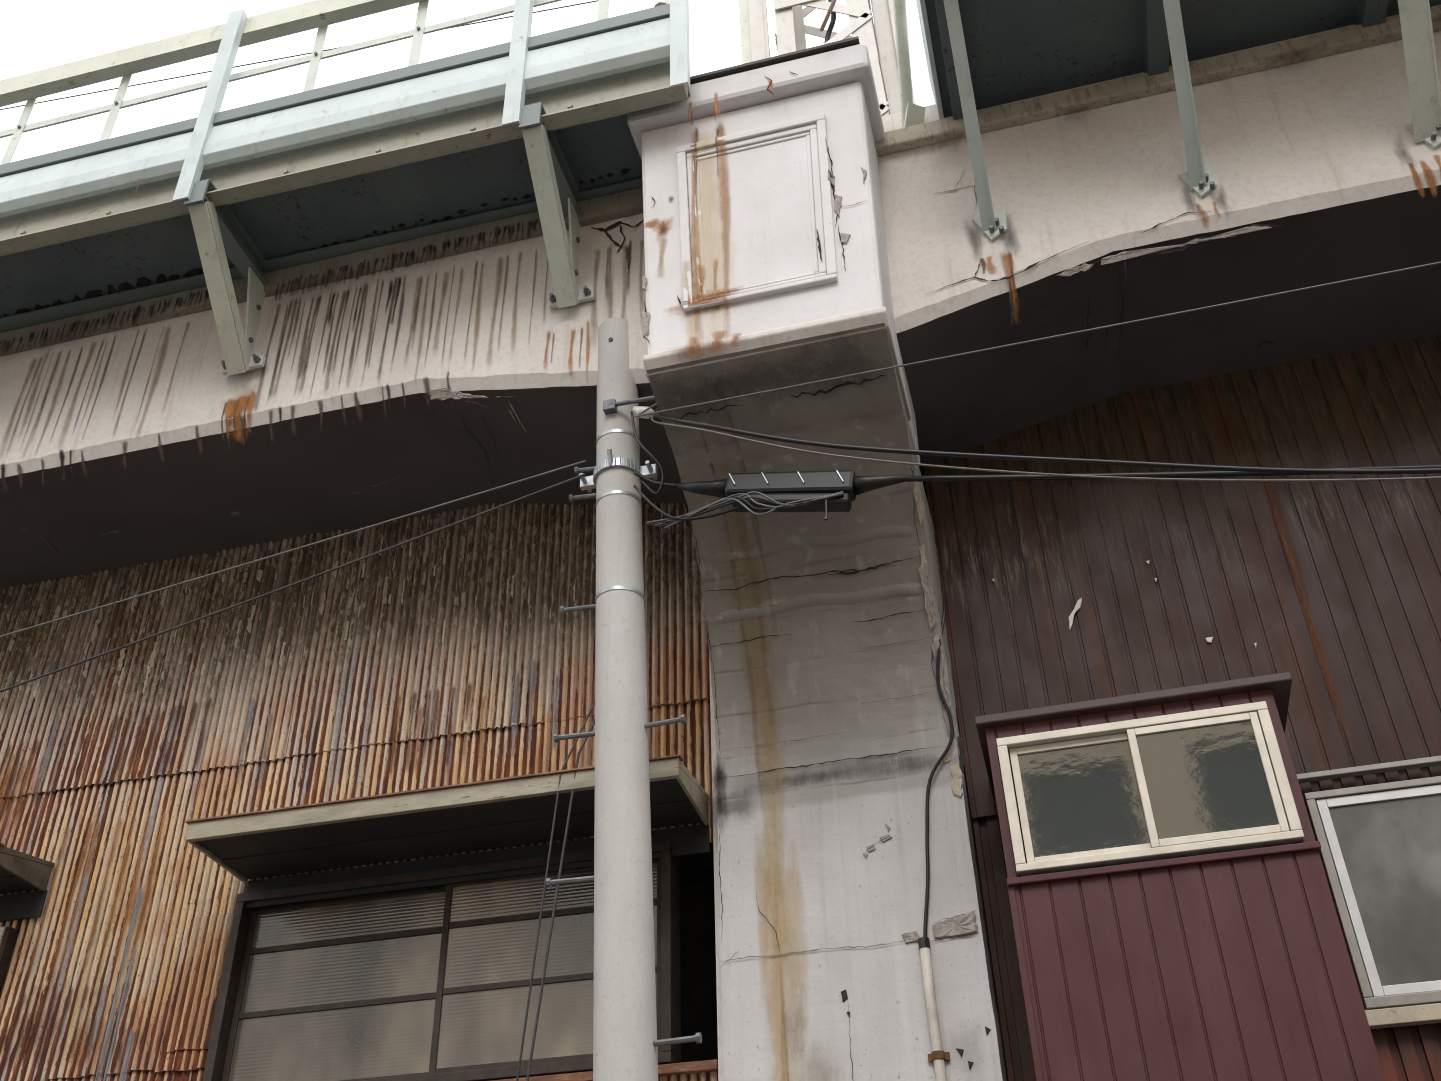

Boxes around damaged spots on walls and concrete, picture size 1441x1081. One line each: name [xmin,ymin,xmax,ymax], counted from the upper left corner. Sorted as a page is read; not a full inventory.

water stain [0,290,209,439]
water stain [259,220,548,412]
crack [591,220,644,266]
rust [688,94,731,309]
crack [930,241,1089,324]
water stain [42,450,86,479]
crack [674,466,932,778]
peeling [1068,598,1082,629]
rust [103,699,211,770]
rust [89,812,165,945]
crack [719,825,912,967]
rust [7,985,102,1053]